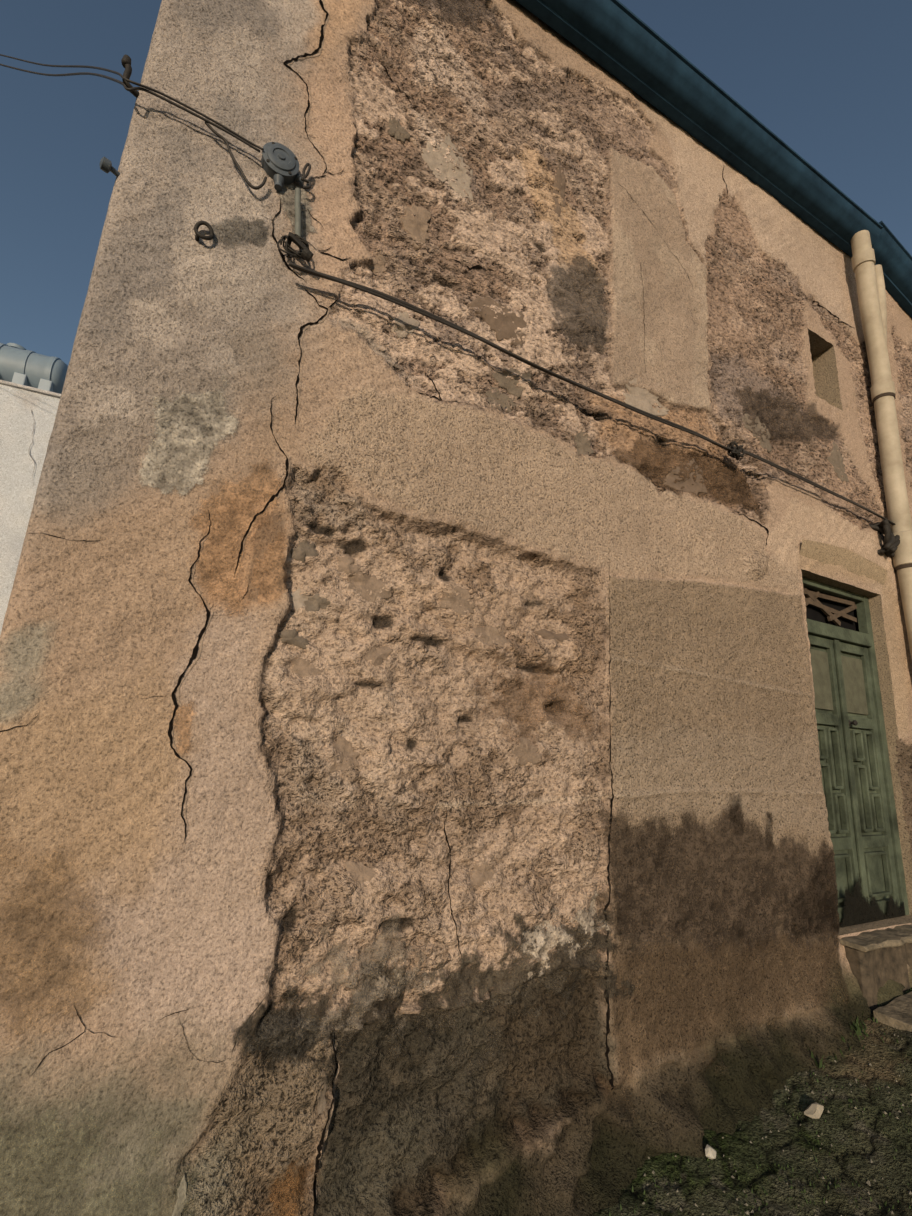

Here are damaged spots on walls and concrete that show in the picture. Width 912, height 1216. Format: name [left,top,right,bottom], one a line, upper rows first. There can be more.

crack [141,199,352,850]
crack [283,0,345,178]
flaking render [328,0,888,532]
flaking render [891,326,912,488]
crack [312,1033,340,1215]
spalling [172,463,613,1216]
leakage [233,794,839,1216]
crack [603,566,614,1090]